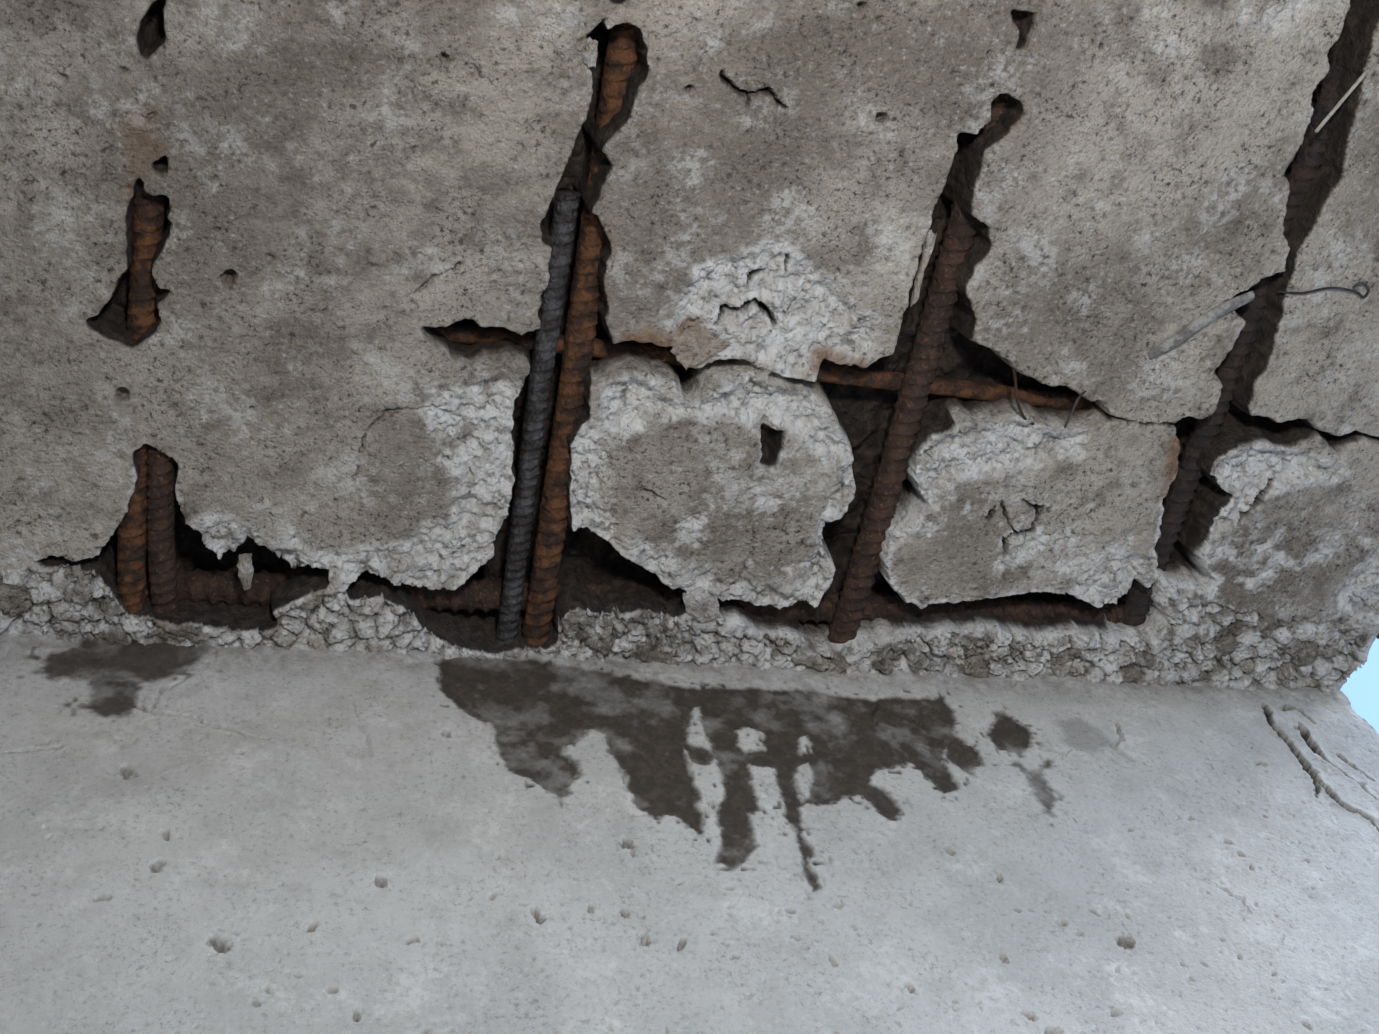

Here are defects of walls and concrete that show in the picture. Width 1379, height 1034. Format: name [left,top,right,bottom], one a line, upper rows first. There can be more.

rust [99,261,131,313]
rust [615,322,674,347]
spalling [0,0,1379,692]
crack [1237,476,1277,528]
water stain [11,637,233,732]
water stain [419,651,1115,901]
crack [1261,701,1379,832]